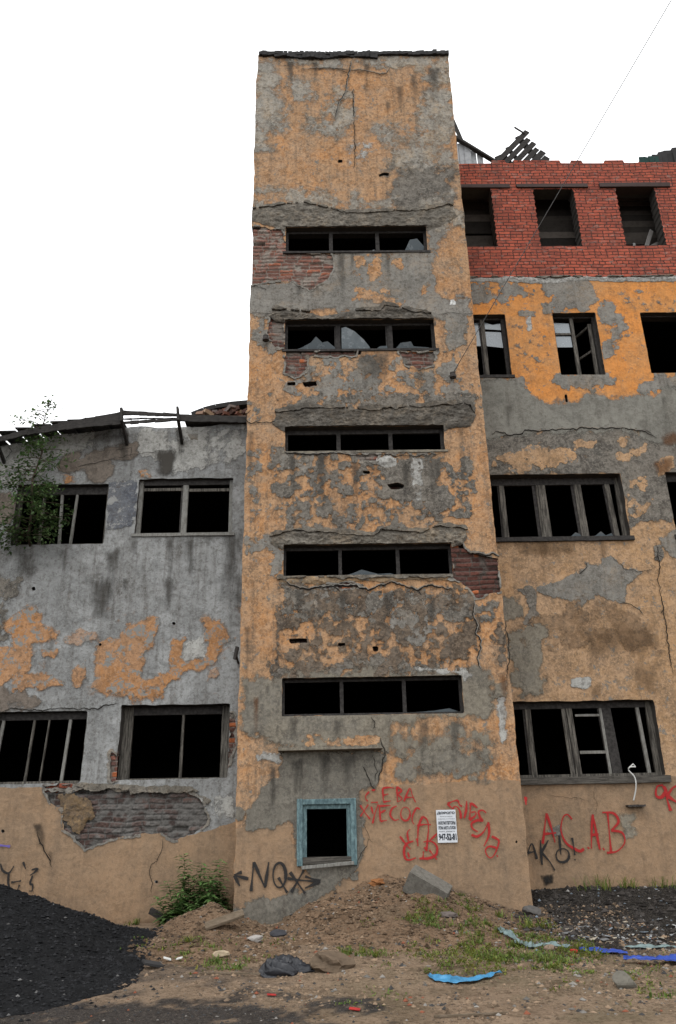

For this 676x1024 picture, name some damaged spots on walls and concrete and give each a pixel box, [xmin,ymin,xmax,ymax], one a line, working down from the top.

crack [310,58,390,166]
peeling [249,56,676,562]
crack [492,426,654,436]
crack [286,580,452,594]
crack [613,544,673,672]
peeling [0,401,664,924]
crack [363,717,388,788]